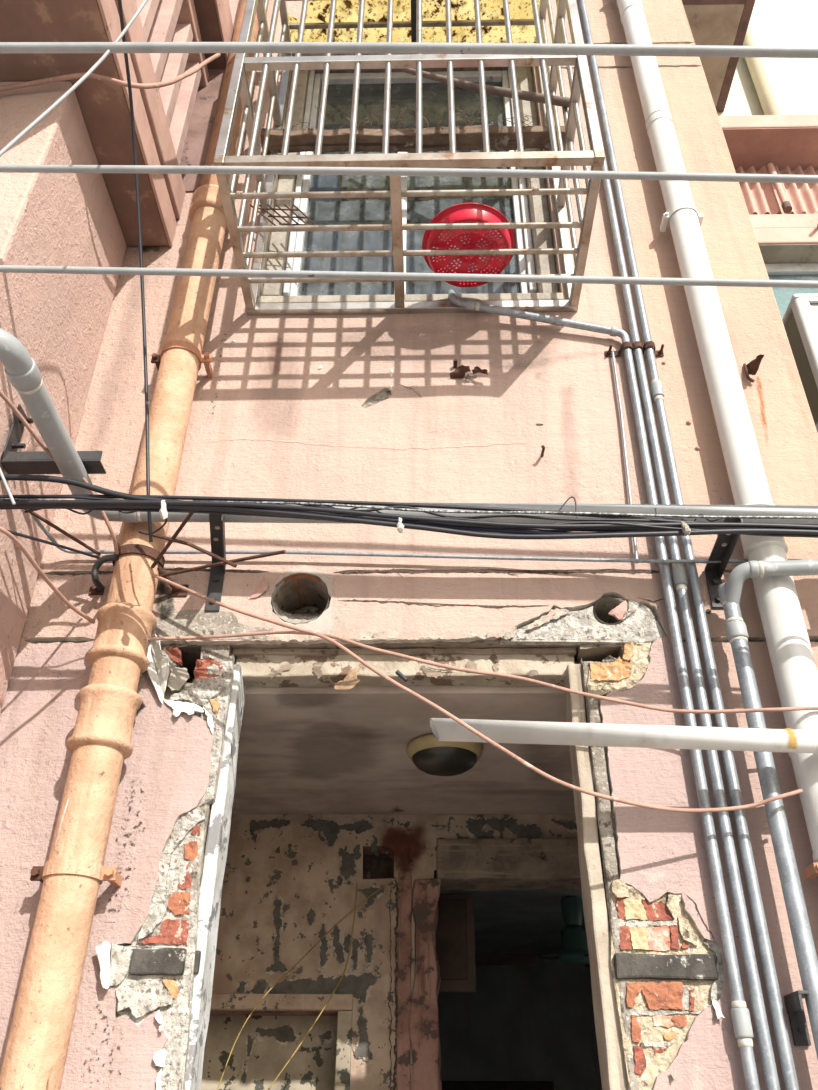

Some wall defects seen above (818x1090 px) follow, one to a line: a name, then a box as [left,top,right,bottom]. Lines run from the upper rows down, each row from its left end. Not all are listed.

spalling [249,576,269,599]
crack [335,568,665,612]
spalling [95,596,666,1090]
spalling [610,879,725,1090]